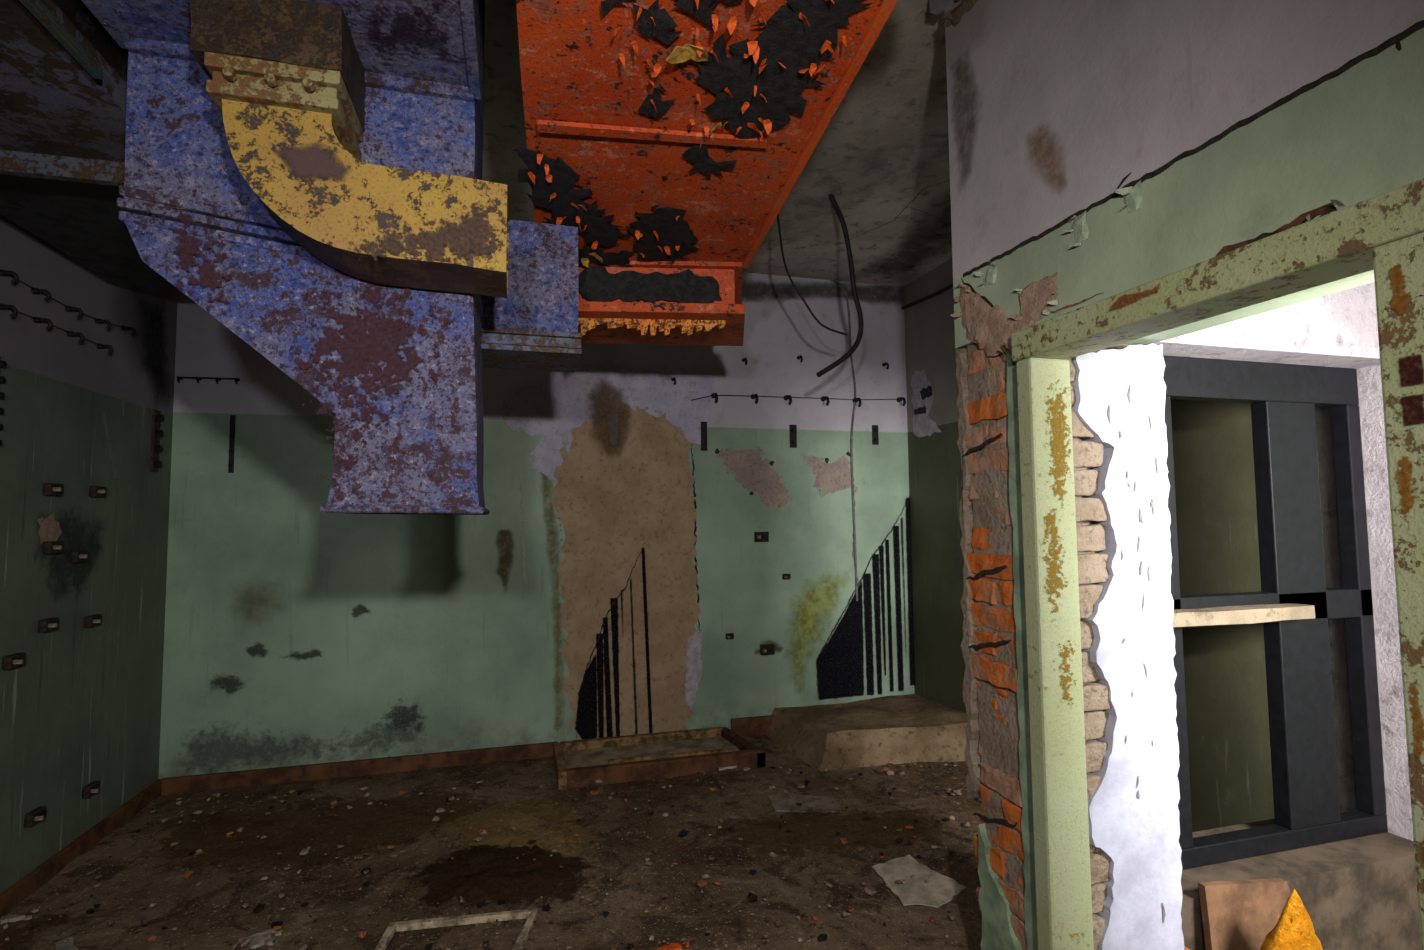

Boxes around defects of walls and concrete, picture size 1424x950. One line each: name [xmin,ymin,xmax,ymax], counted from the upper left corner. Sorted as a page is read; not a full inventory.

corrosion [276,143,346,179]
crack [961,20,1424,307]
corrosion [147,205,243,316]
corrosion [327,201,505,262]
crack [1044,293,1102,316]
peeling [1215,200,1346,257]
corrosion [279,274,452,487]
peeling [911,369,941,437]
peeling [553,403,701,740]
leakage [816,498,915,695]
spalling [950,262,1059,950]
leakage [387,705,421,731]